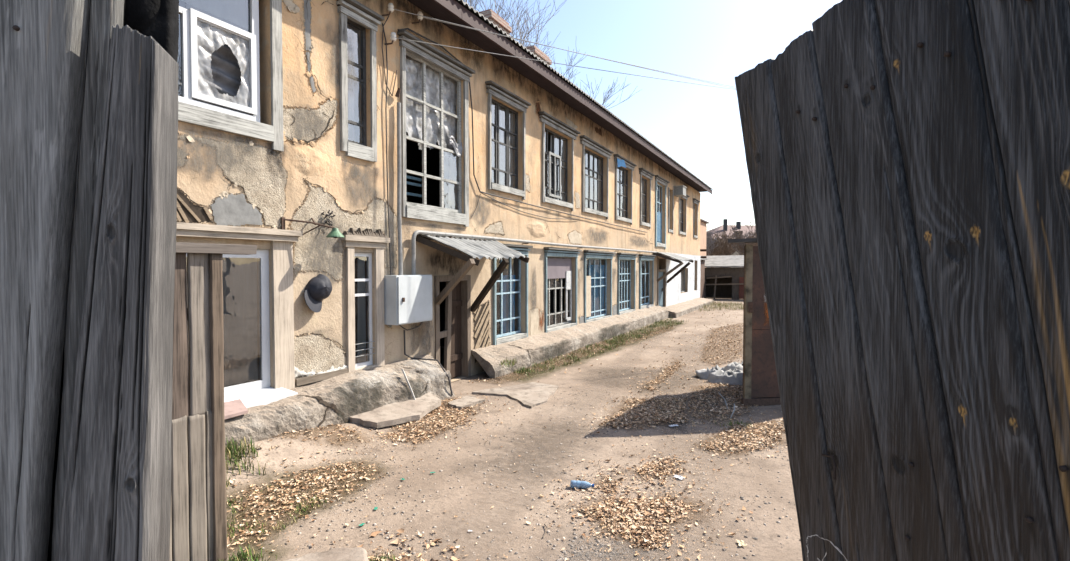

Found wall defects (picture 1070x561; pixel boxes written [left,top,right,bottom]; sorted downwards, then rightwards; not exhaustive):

spalling [177,0,398,282]
spalling [294,332,348,378]